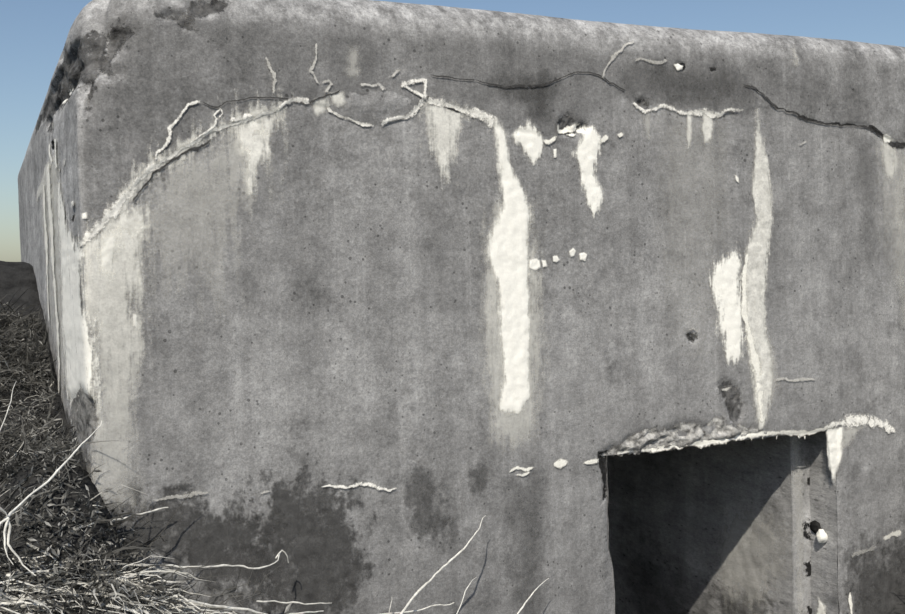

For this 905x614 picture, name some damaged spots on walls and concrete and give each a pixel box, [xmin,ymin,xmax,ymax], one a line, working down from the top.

crack [78,43,424,261]
crack [433,41,743,147]
crack [743,84,905,149]
water stain [37,158,150,471]
water stain [424,97,538,414]
water stain [739,109,774,430]
crack [153,491,207,501]
water stain [110,469,371,614]
crack [322,482,396,492]
spalling [597,380,827,500]